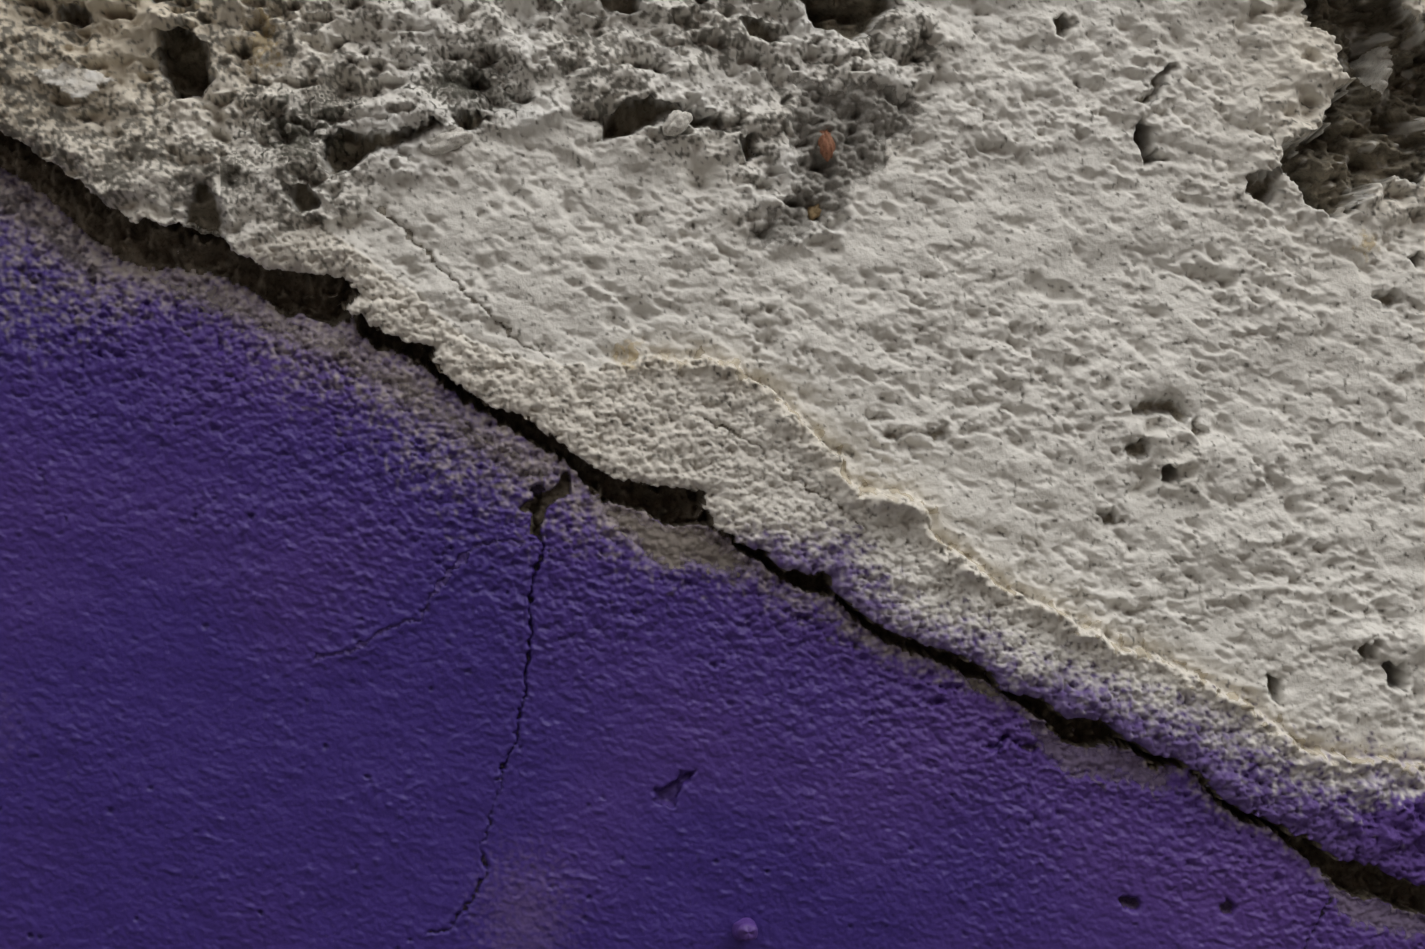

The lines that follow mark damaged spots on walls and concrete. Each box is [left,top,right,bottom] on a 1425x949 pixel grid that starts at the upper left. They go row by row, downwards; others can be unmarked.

peeling [34,60,114,101]
spalling [1280,0,1425,218]
spalling [747,75,923,247]
peeling [0,191,104,286]
crack [377,206,542,352]
crack [704,418,762,449]
crack [520,472,570,541]
crack [315,539,524,661]
crack [532,551,543,577]
crack [429,820,491,932]
crack [1304,895,1334,949]